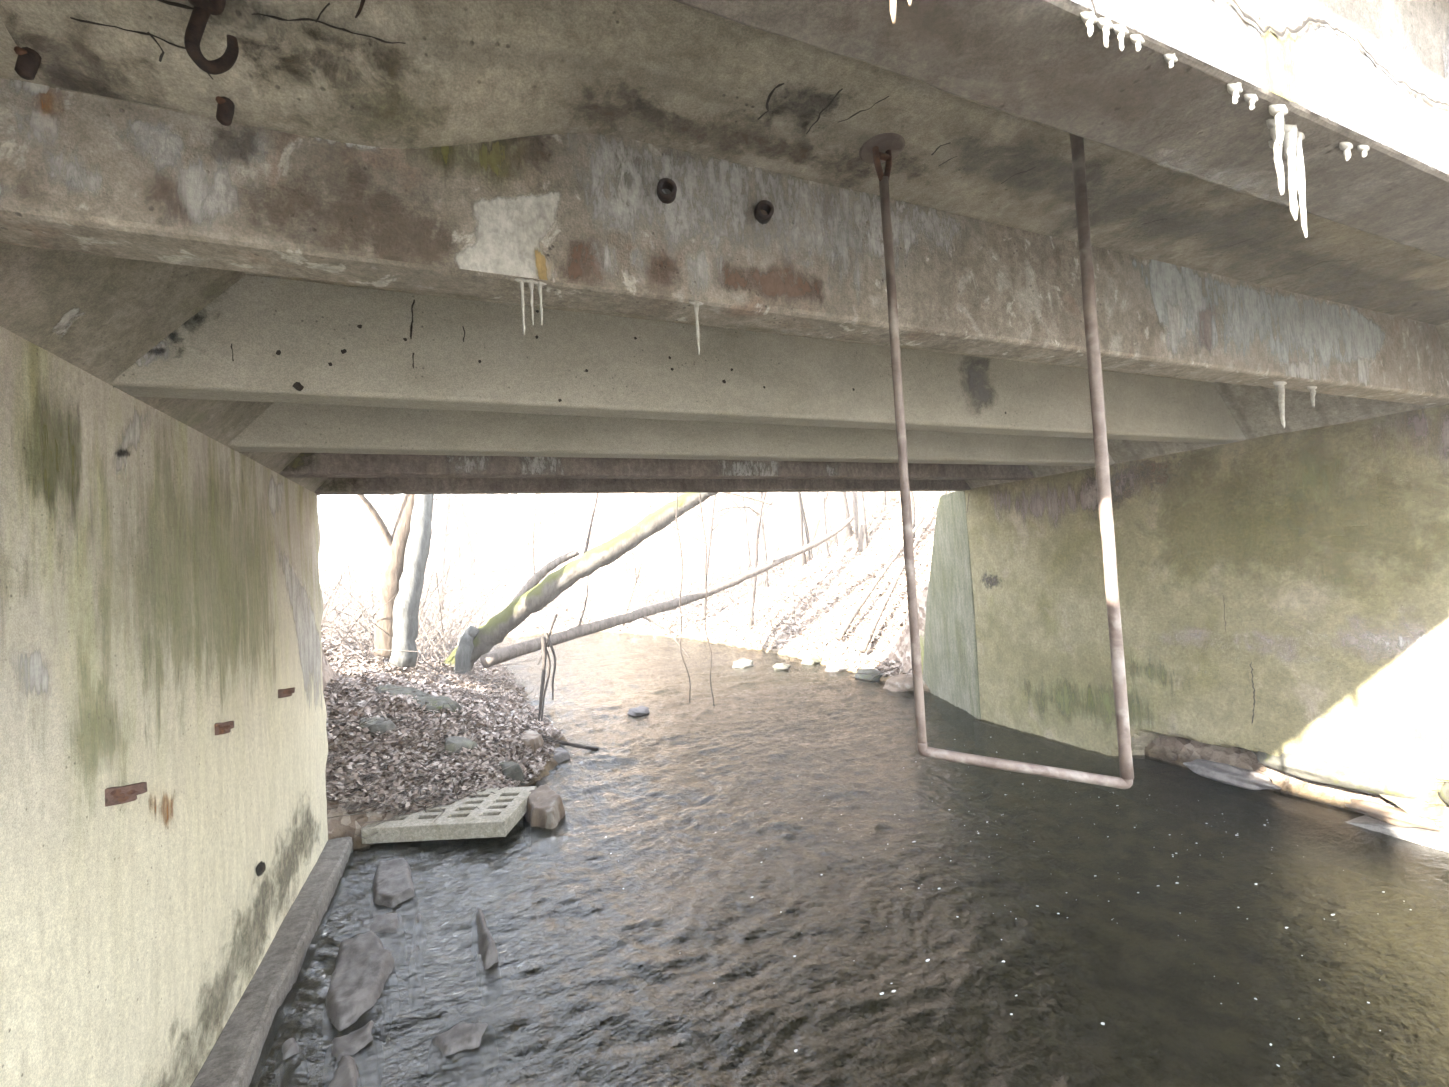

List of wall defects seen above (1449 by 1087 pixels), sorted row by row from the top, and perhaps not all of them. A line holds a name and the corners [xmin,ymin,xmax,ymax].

crack [70,0,213,80]
crack [252,3,406,44]
water stain [896,0,963,39]
crack [1232,0,1449,106]
water stain [961,138,1449,324]
water stain [53,308,84,337]
water stain [165,312,207,351]
water stain [116,411,150,471]
water stain [279,548,322,705]
corrosion [110,789,137,802]
corrosion [150,795,174,824]